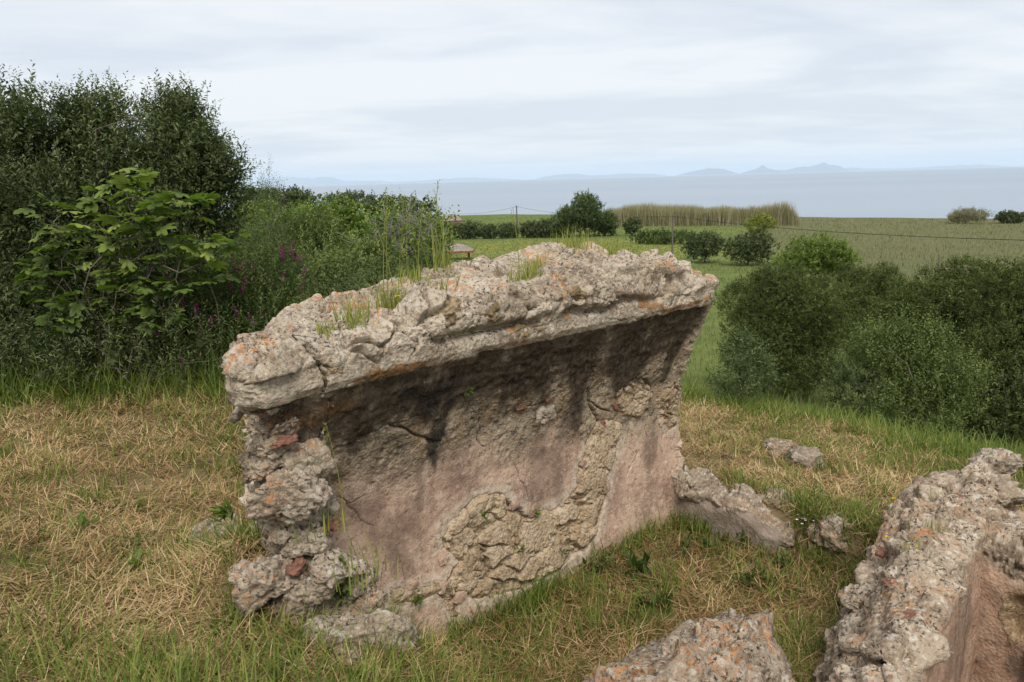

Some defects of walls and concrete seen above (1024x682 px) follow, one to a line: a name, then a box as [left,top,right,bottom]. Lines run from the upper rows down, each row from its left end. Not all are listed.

crack [388,415,428,439]
damp [241,306,705,469]
spalling [390,377,679,617]